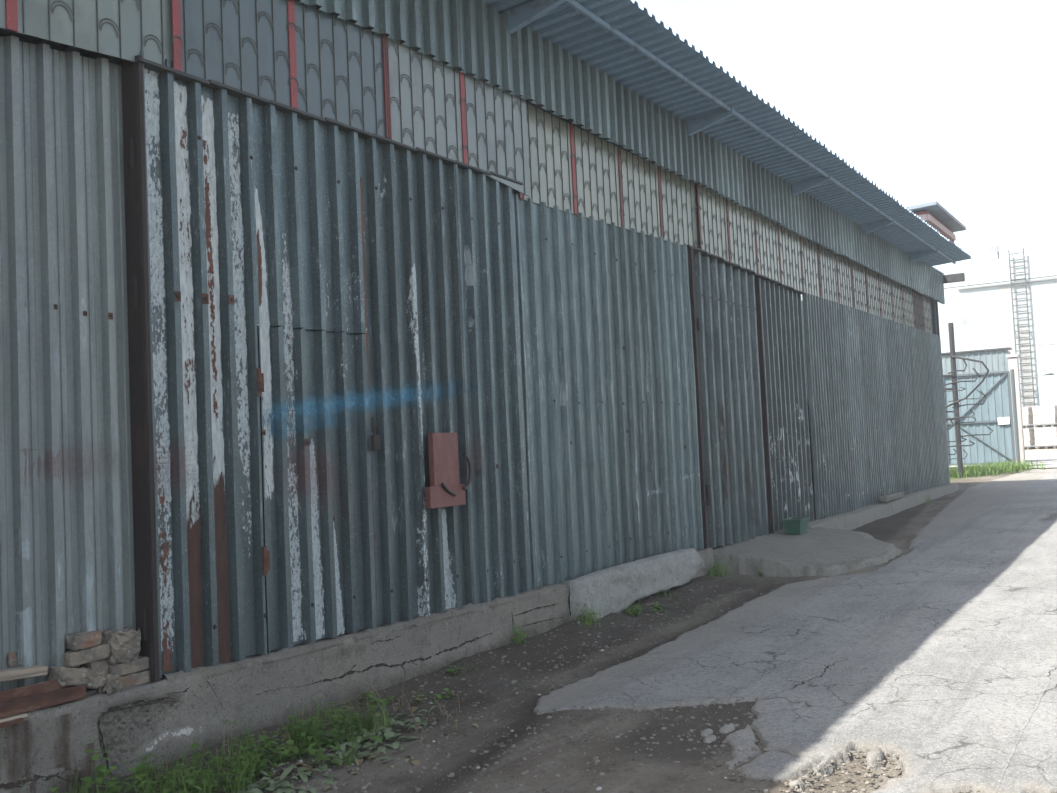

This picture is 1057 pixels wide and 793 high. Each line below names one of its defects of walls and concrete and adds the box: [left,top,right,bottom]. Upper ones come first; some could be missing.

spalling [98,688,189,777]
peeling [144,68,175,673]
peeling [174,82,204,668]
peeling [201,95,231,663]
peeling [228,112,374,642]
crack [256,589,571,695]
peeling [398,246,435,460]
peeling [416,473,458,616]
peeling [770,407,812,511]